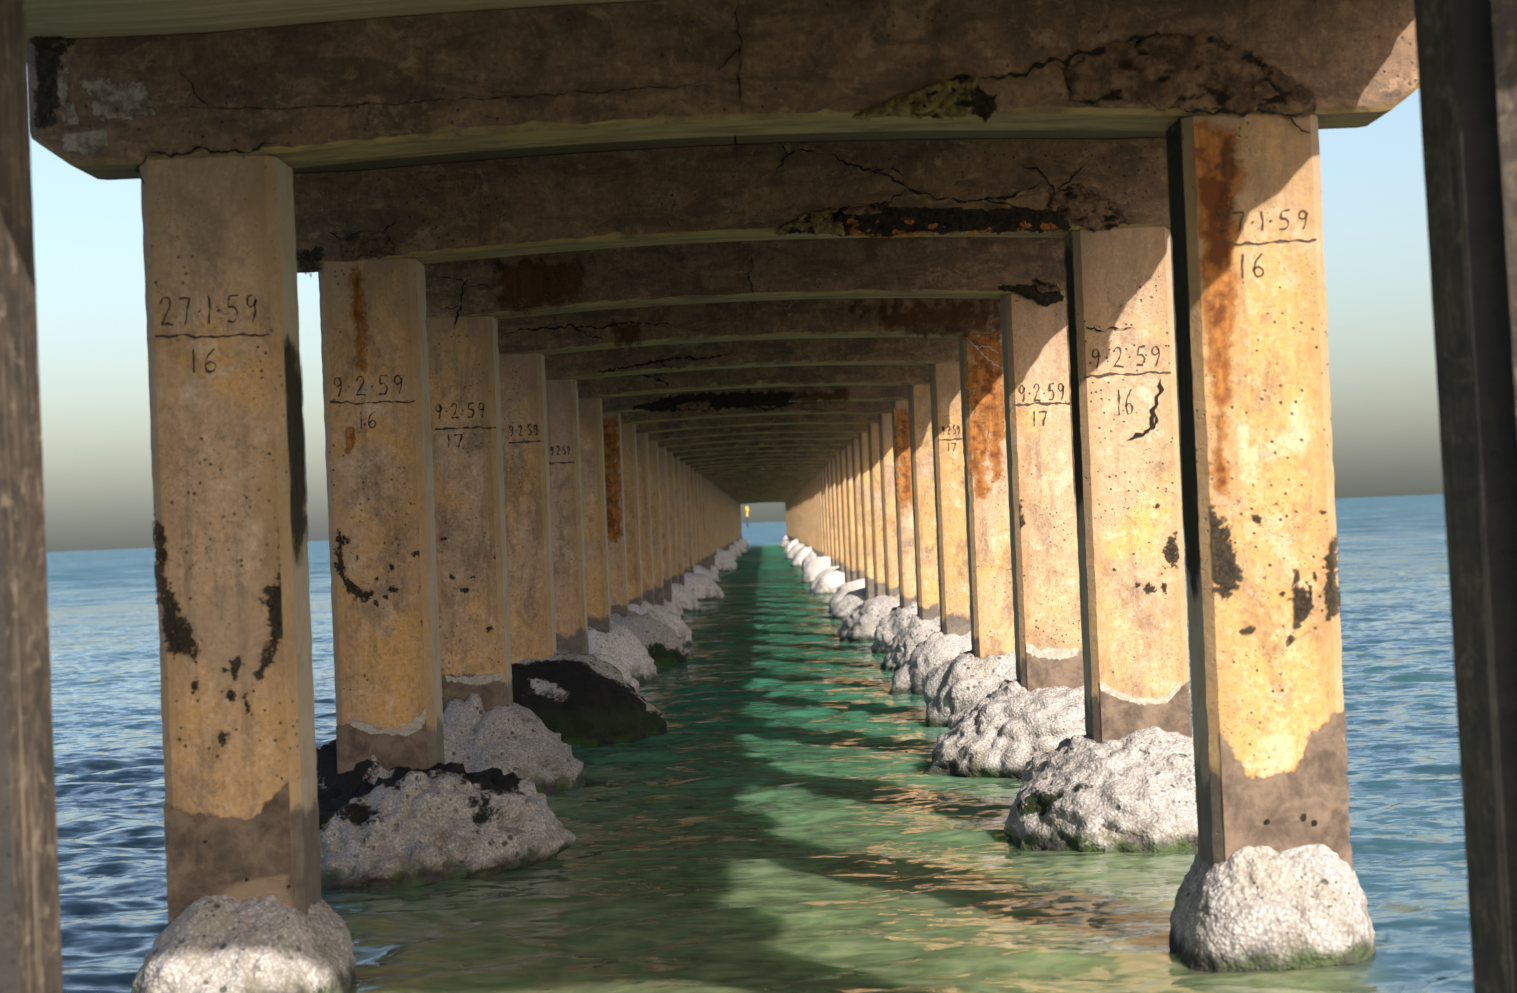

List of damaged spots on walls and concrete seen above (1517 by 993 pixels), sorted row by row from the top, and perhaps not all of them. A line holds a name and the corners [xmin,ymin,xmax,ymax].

crack [136,1,743,184]
spalling [1064,31,1316,116]
crack [776,145,1085,215]
spalling [838,184,1130,237]
rust [1194,122,1245,493]
rust [850,298,1006,508]
crack [1127,379,1164,440]
rust [603,417,623,542]
damp [1210,505,1244,601]
damp [1280,535,1341,646]
damp [1220,709,1353,872]
damp [163,782,294,926]